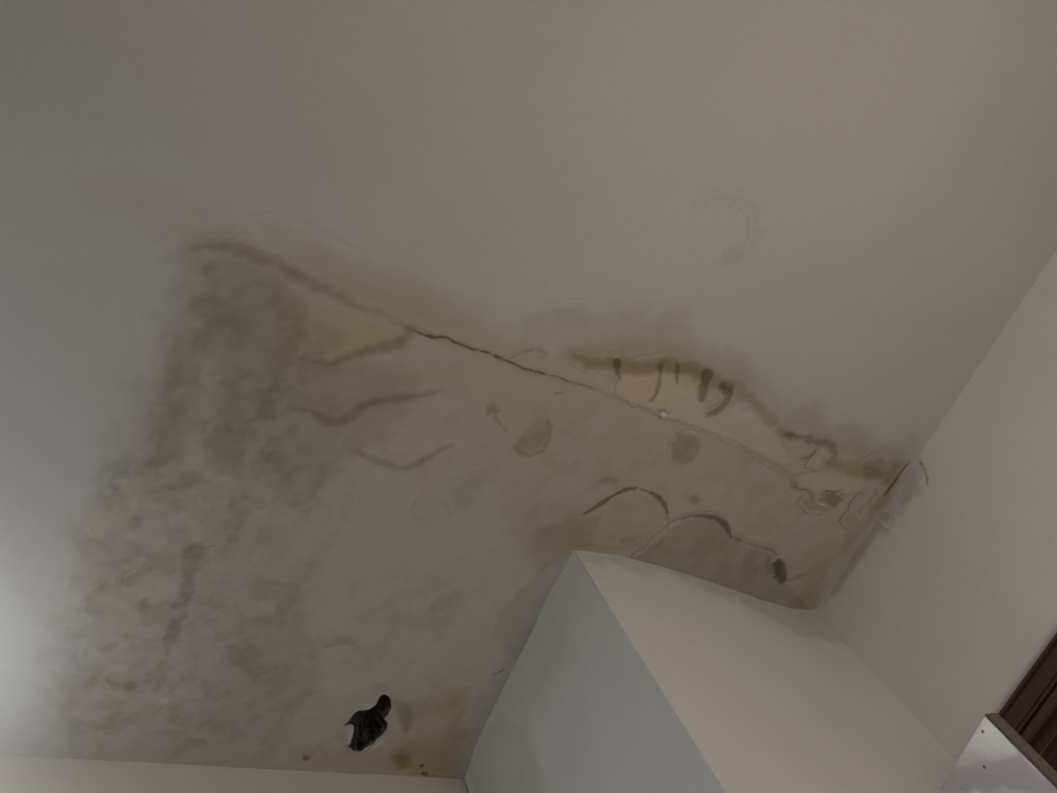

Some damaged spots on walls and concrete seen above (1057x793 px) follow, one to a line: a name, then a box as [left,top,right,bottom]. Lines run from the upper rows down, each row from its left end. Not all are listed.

damp [4,149,928,793]
spalling [511,413,557,460]
crack [403,320,797,479]
spalling [344,694,391,751]